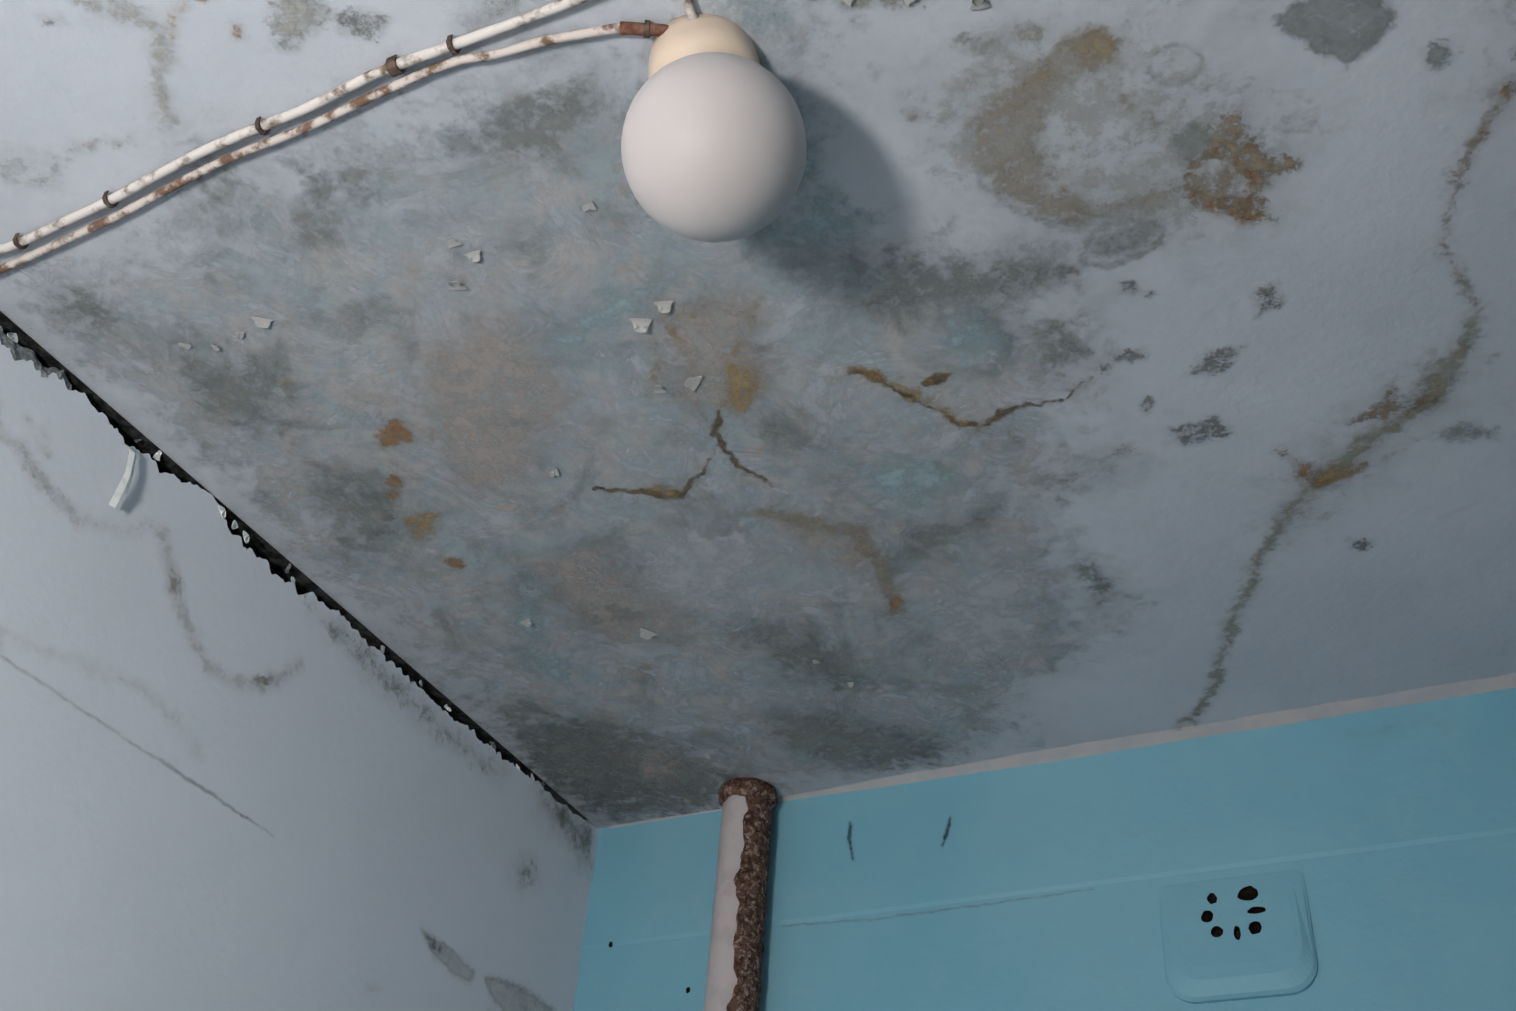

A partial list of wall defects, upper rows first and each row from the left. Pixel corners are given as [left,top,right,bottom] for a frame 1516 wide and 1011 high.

peeling [969,0,990,10]
leakage [966,25,1174,226]
leakage [1100,349,1144,371]
crack [848,366,1092,430]
leakage [1171,418,1228,445]
leakage [19,85,1090,848]
crack [0,311,588,820]